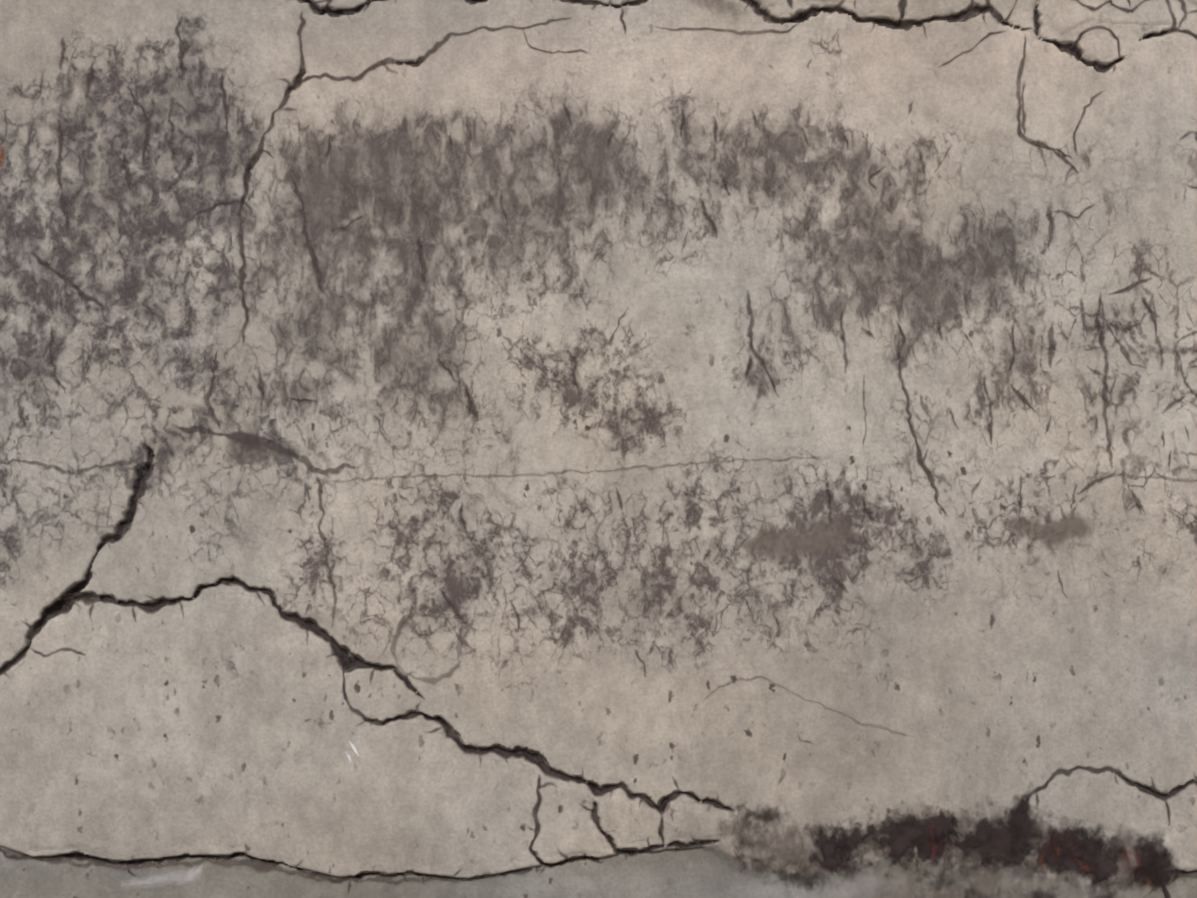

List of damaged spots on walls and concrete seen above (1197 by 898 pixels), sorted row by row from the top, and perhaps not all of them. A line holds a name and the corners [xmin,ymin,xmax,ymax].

crack [664,25,722,33]
crack [743,0,1197,157]
crack [194,0,647,341]
leakage [0,18,717,512]
leakage [669,97,1162,457]
leakage [1161,336,1197,407]
leakage [291,533,343,611]
leakage [363,457,952,655]
leakage [972,462,1155,547]
crack [0,426,730,889]
spalling [720,794,1178,898]
crack [1026,766,1197,822]